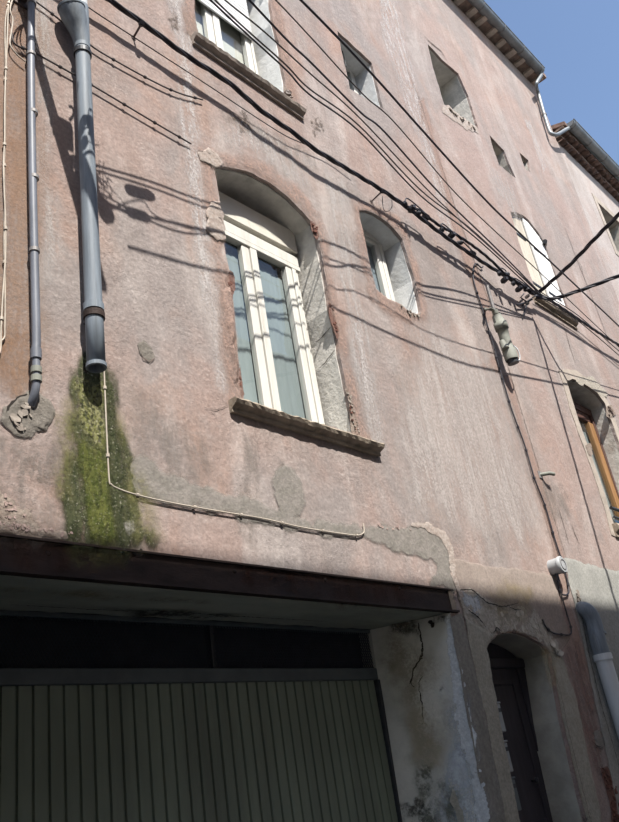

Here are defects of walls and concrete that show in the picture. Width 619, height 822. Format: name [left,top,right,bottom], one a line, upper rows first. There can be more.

spalling [0,390,55,437]
leakage [66,378,144,543]
spalling [0,490,73,540]
peeling [458,587,564,658]
crack [410,623,424,724]
peeling [444,614,490,822]
leakage [401,744,475,822]
spalling [600,766,619,822]